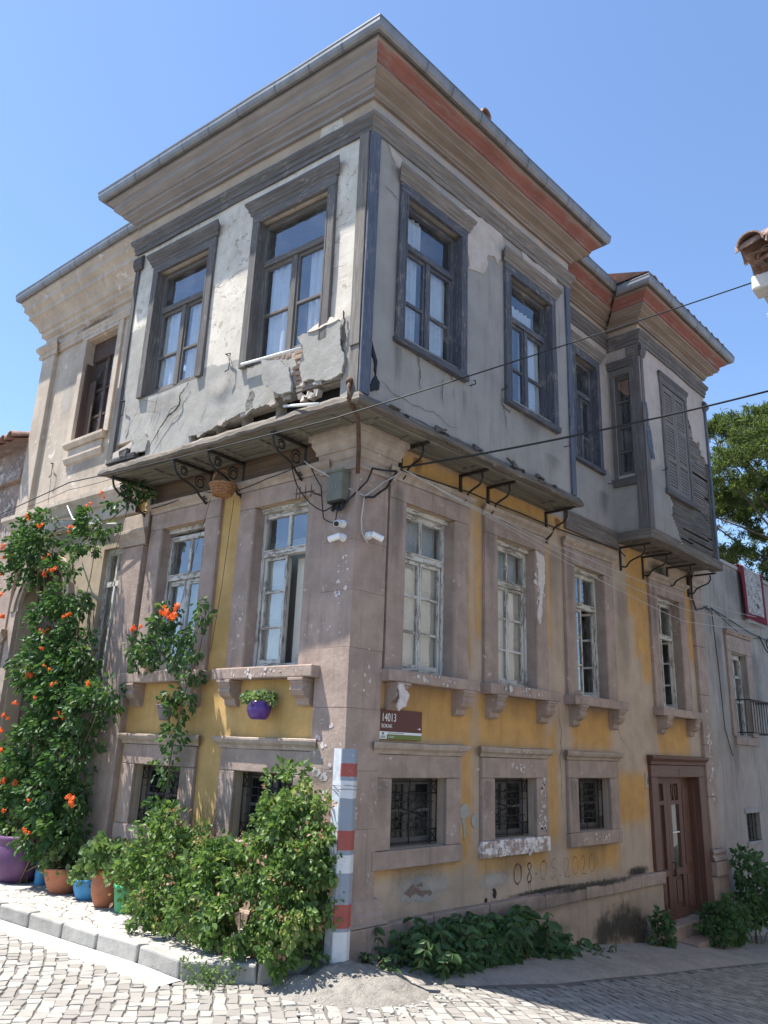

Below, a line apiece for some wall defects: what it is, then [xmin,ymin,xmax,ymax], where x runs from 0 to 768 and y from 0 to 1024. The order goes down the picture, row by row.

crack [127,383,207,447]
flaking render [186,317,346,439]
peeling [312,719,333,800]